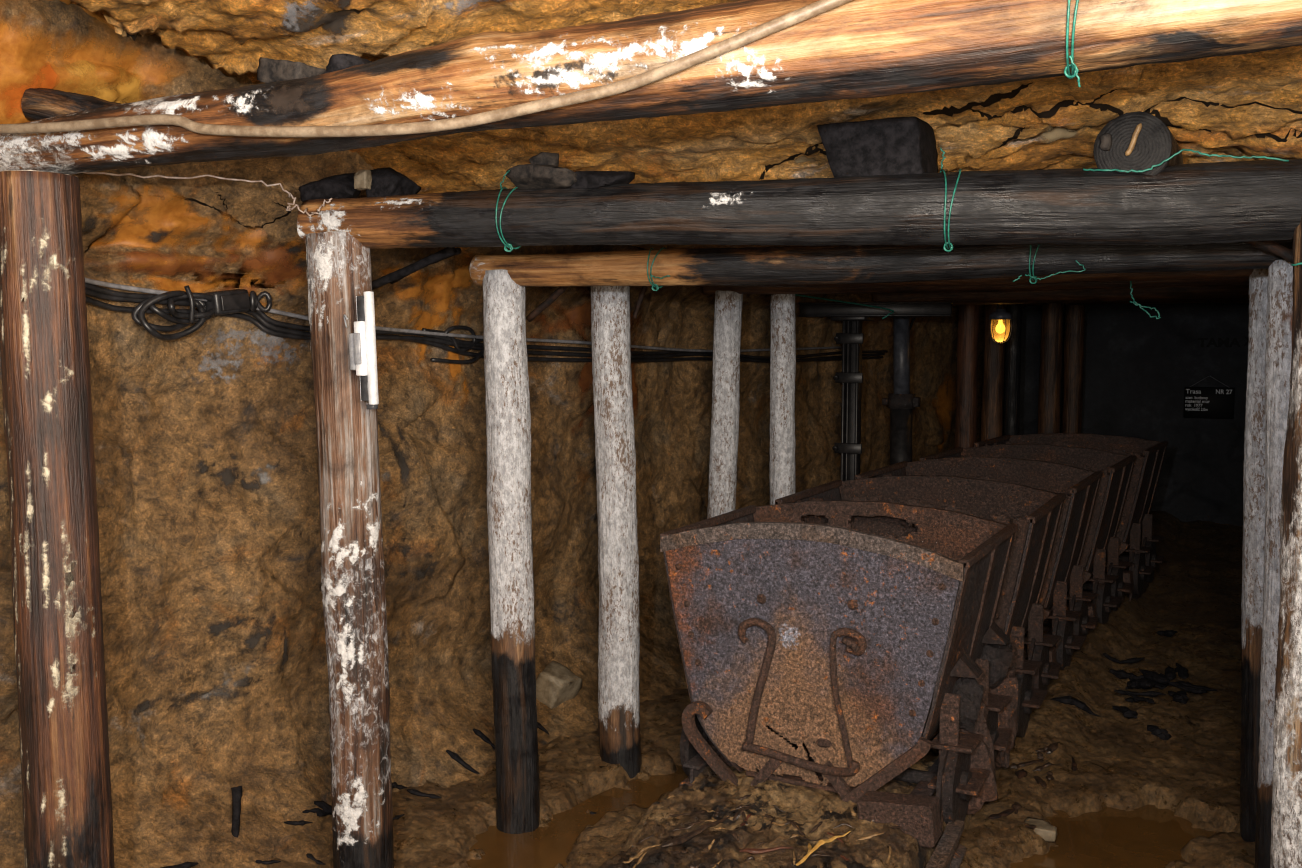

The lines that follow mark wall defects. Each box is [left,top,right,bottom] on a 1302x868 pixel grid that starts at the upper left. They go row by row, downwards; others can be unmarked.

leakage [474,26,780,94]
leakage [0,91,258,163]
leakage [320,414,440,704]
leakage [332,778,384,849]
leakage [1273,764,1302,834]